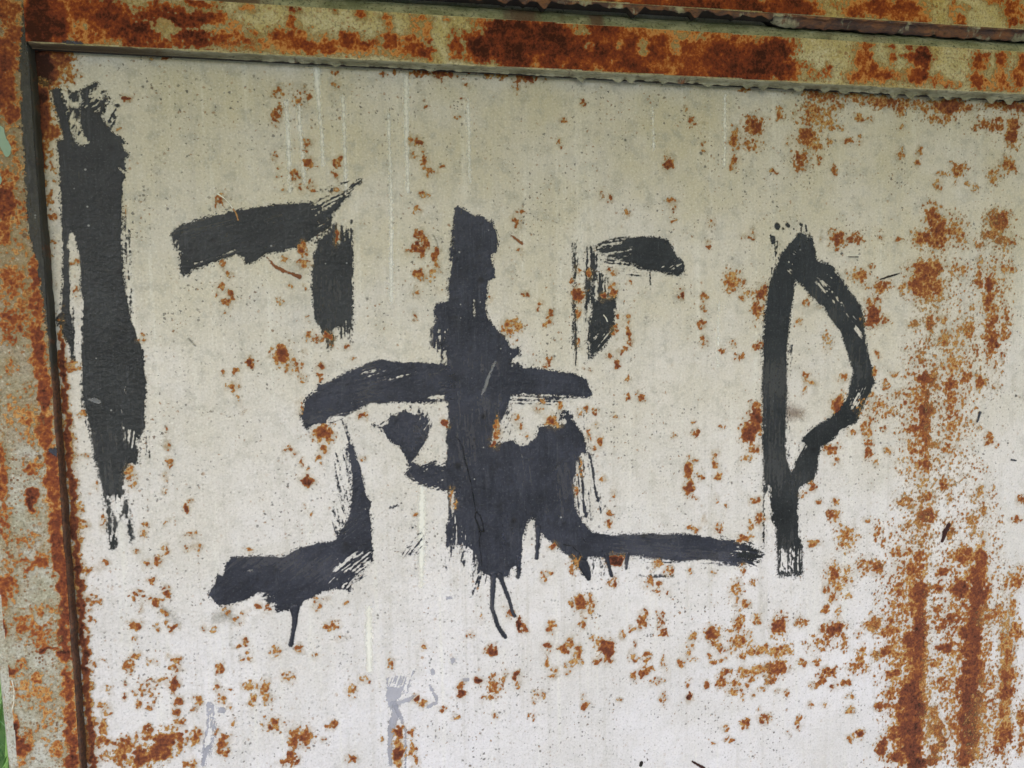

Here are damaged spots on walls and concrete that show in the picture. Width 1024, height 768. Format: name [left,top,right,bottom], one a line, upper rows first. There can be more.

corrosion [594,0,1024,29]
corrosion [443,16,1024,186]
corrosion [0,0,470,768]
corrosion [543,161,1024,768]
corrosion [503,606,529,633]
corrosion [483,644,498,657]
corrosion [456,669,520,700]